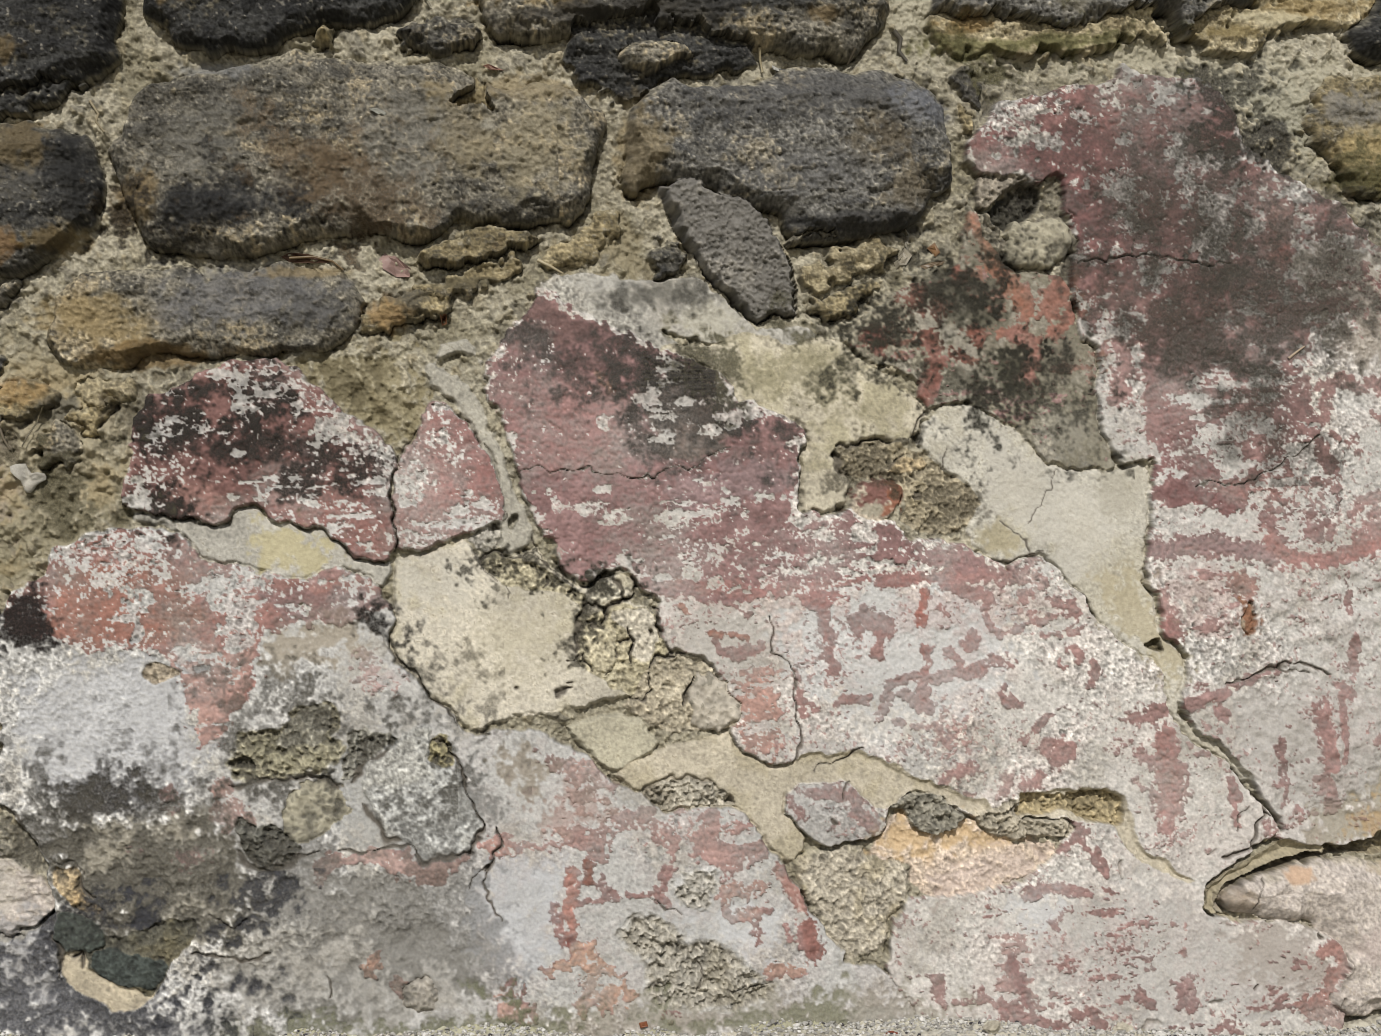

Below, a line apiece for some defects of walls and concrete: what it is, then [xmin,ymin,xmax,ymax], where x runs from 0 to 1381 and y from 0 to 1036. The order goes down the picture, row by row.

crack [1077,240,1232,268]
peeling [10,464,47,493]
flaking render [208,701,399,869]
crack [228,654,504,923]
crack [769,616,865,826]
crack [1222,768,1284,910]
crack [1225,661,1332,685]
flaking render [1203,736,1381,926]
peeling [1299,614,1381,816]
flaking render [51,867,198,1014]
peeling [905,887,1188,1031]
peeling [1166,939,1353,1036]